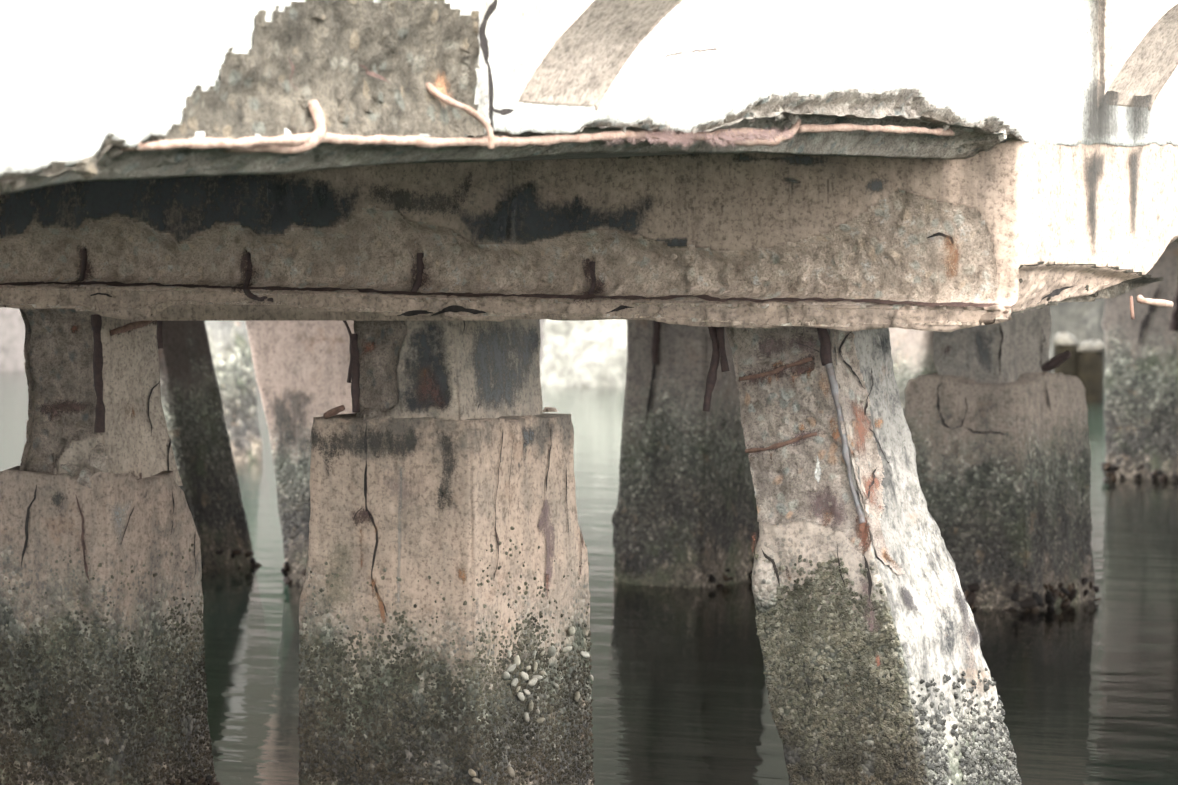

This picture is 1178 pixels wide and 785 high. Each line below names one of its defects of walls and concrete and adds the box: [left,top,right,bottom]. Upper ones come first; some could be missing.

spalling [0,0,1023,195]
damp [0,173,652,244]
crack [0,281,1003,373]
spalling [0,187,1178,577]
crack [646,364,656,421]
corrosion [743,334,817,385]
corrosion [747,402,883,460]
crack [795,331,889,502]
crack [21,485,37,567]
crack [75,494,91,584]
crack [353,424,387,616]
corrosion [808,476,881,549]